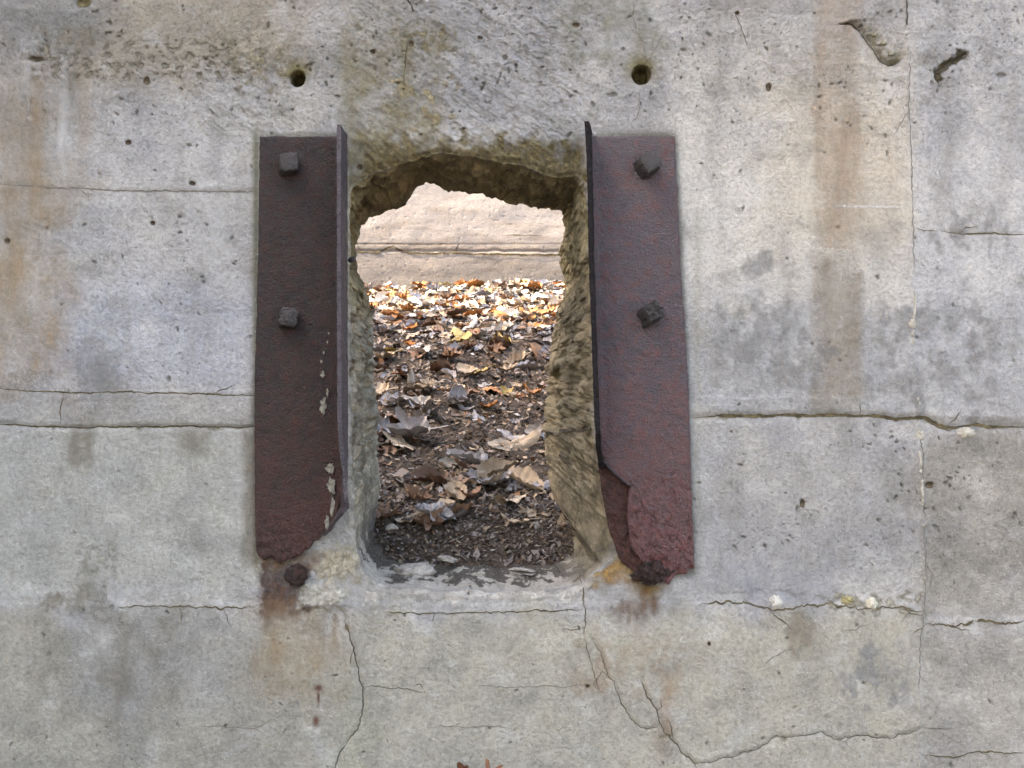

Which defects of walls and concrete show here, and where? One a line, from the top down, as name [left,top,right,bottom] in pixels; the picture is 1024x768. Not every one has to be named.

spalling [840,23,901,67]
spalling [933,48,968,83]
crack [892,52,1024,267]
crack [2,184,255,195]
damp [880,307,956,366]
crack [0,384,254,429]
peeling [324,463,335,529]
crack [692,401,1023,688]
rust [261,553,335,615]
rust [594,562,657,606]
crack [110,605,250,626]
crack [390,577,951,768]